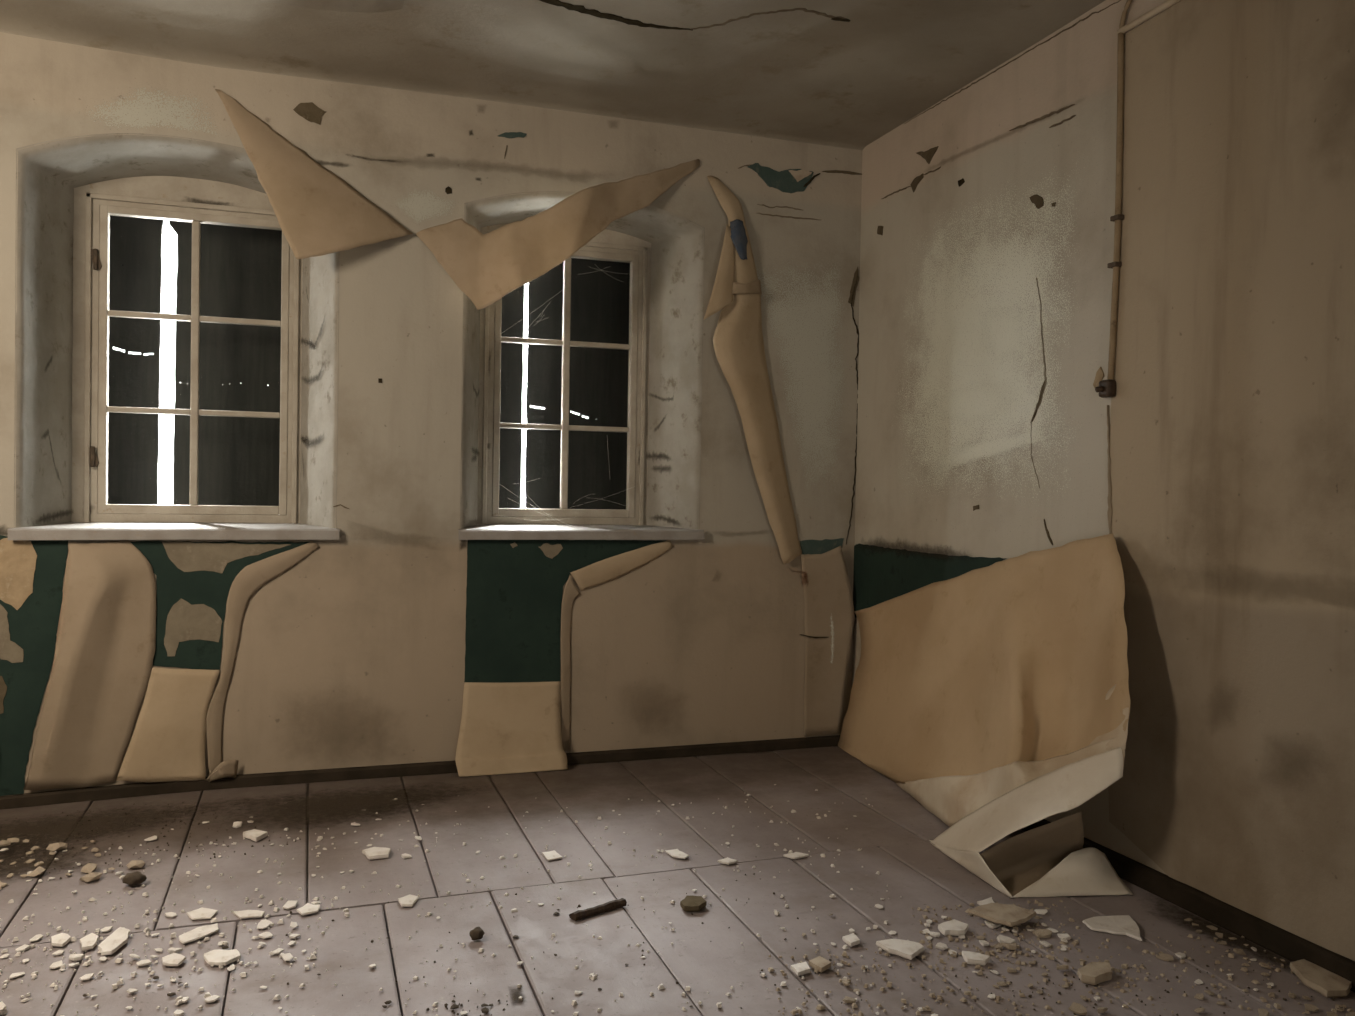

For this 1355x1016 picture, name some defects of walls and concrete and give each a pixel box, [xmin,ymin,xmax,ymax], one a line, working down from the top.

spalling [293,102,326,125]
crack [257,0,404,13]
crack [539,0,850,31]
spalling [738,163,820,193]
crack [1009,104,1076,131]
crack [846,267,859,544]
crack [1030,278,1053,545]
peeling [0,535,320,796]
peeling [455,540,674,777]
peeling [799,538,1007,736]